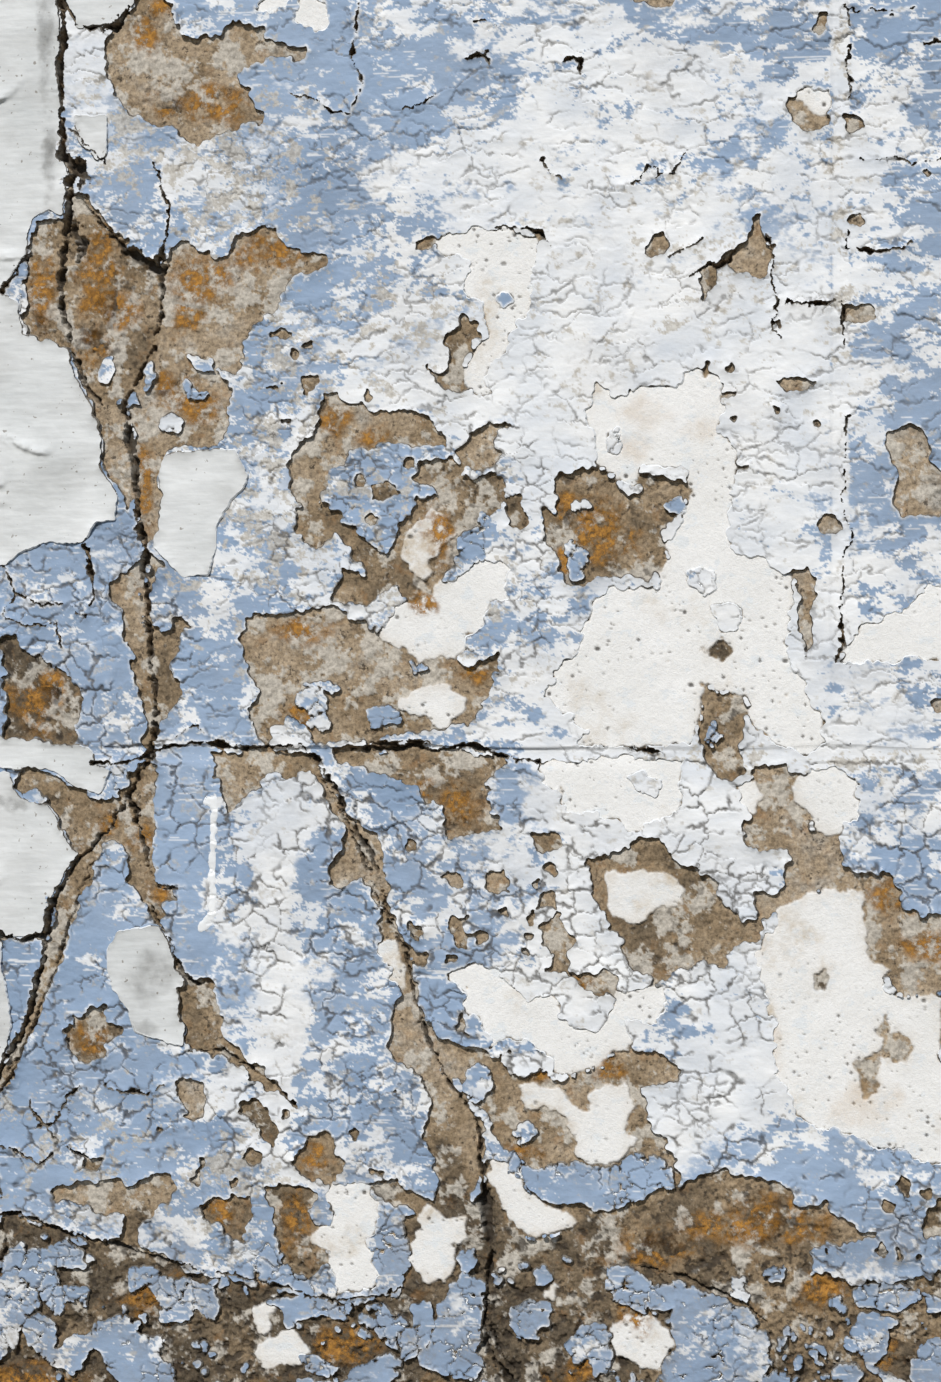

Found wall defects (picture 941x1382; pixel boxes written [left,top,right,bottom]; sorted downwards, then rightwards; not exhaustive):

peeling [105,0,328,147]
flaking render [416,226,541,396]
peeling [646,232,669,257]
peeling [699,214,776,301]
peeling [847,214,865,227]
peeling [840,304,876,323]
spalling [0,184,328,1089]
crack [0,0,546,1382]
crack [632,746,660,754]
flaking render [0,362,941,1382]